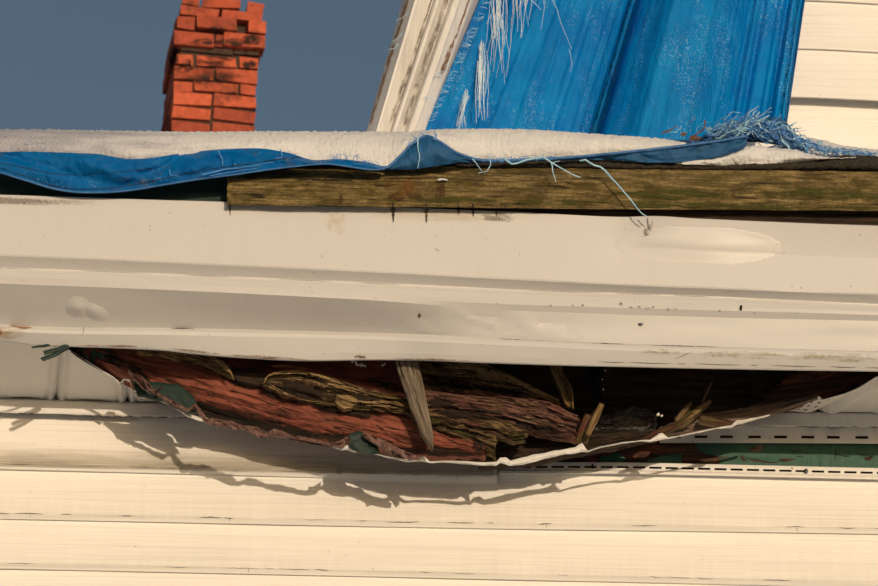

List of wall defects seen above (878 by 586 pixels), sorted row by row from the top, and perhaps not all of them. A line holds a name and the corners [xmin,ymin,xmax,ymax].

peeling [76,347,111,363]
peeling [600,453,625,462]
peeling [648,453,682,463]
peeling [695,443,878,468]